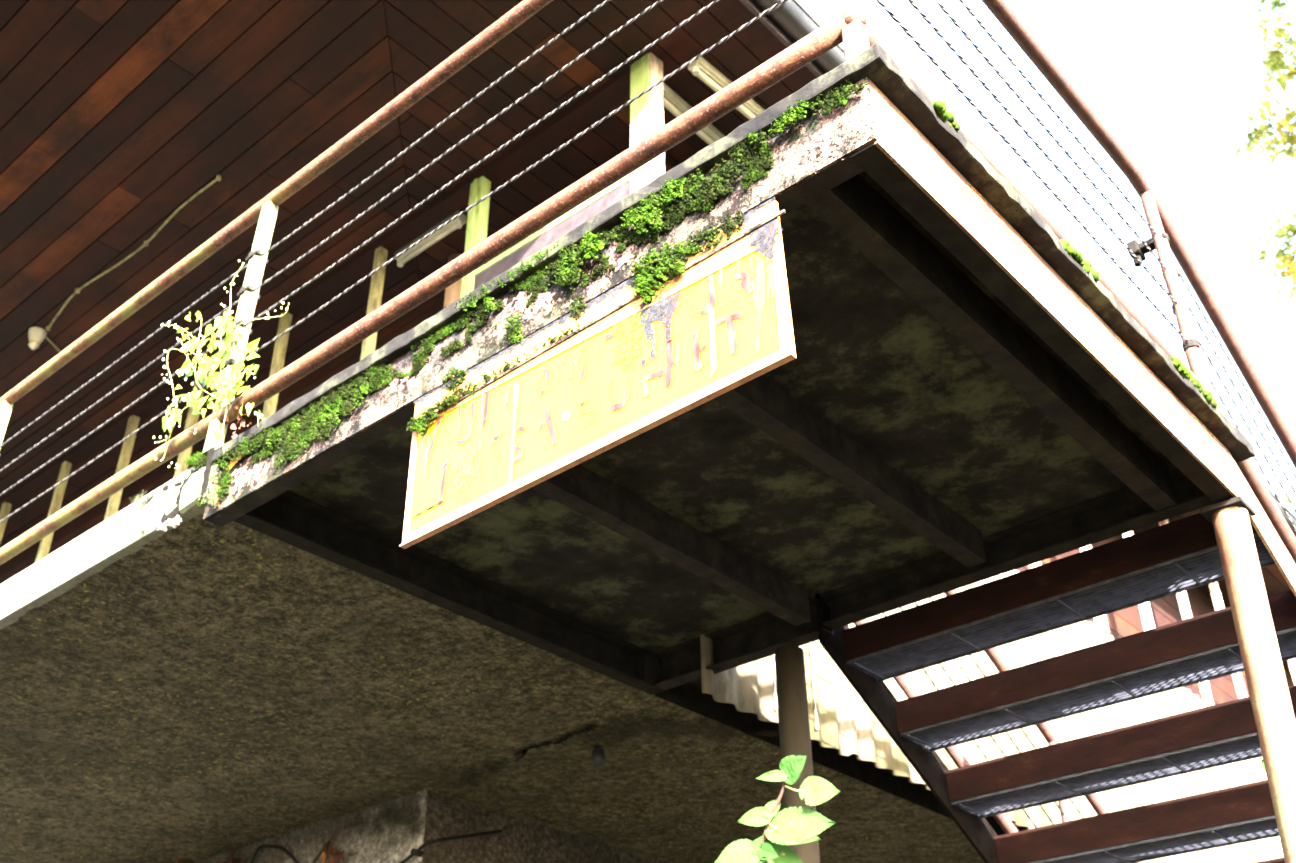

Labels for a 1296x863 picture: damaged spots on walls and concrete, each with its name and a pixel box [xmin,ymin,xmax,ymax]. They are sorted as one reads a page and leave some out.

water stain [675,197,782,263]
corrosion [960,184,1033,259]
water stain [414,274,653,404]
water stain [612,294,680,371]
corrosion [707,303,717,377]
corrosion [719,256,775,351]
corrosion [1120,343,1178,422]
corrosion [1194,417,1225,465]
corrosion [1255,580,1293,723]